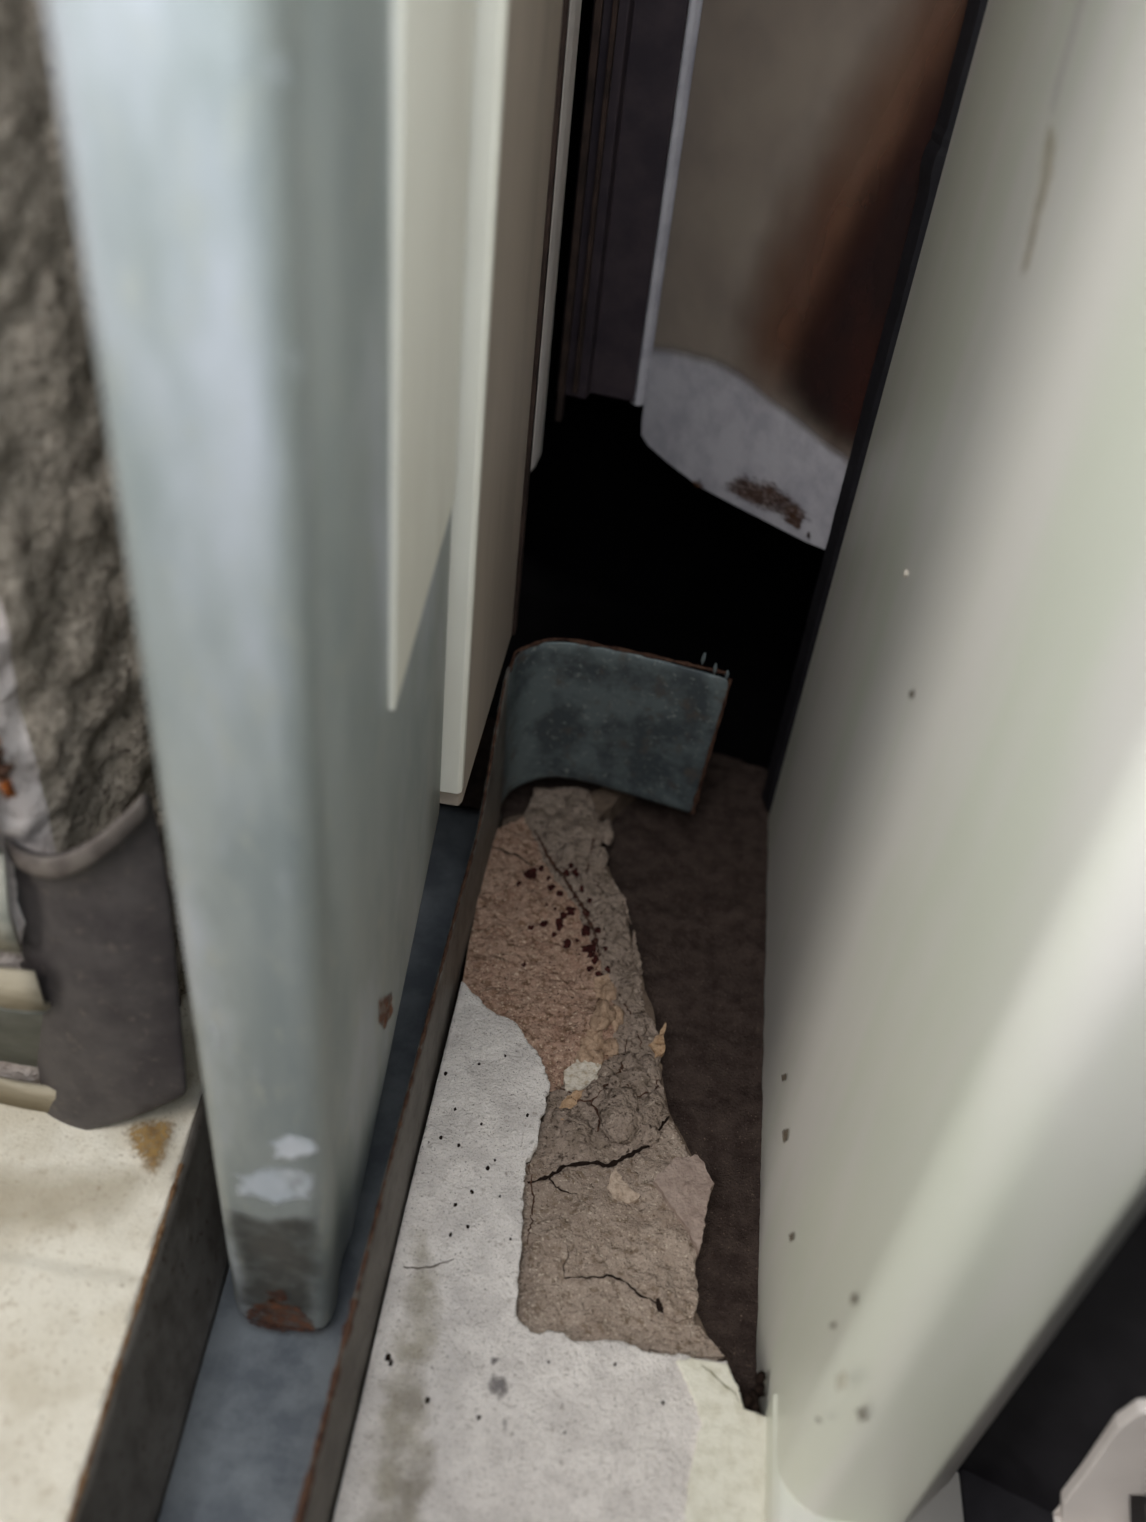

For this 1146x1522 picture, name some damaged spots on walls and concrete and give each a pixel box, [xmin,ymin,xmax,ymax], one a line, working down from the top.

corrosion [0,741,18,800]
crack [527,1116,669,1194]
spalling [463,787,766,1522]
corrosion [247,1290,315,1332]
crack [563,1247,666,1313]